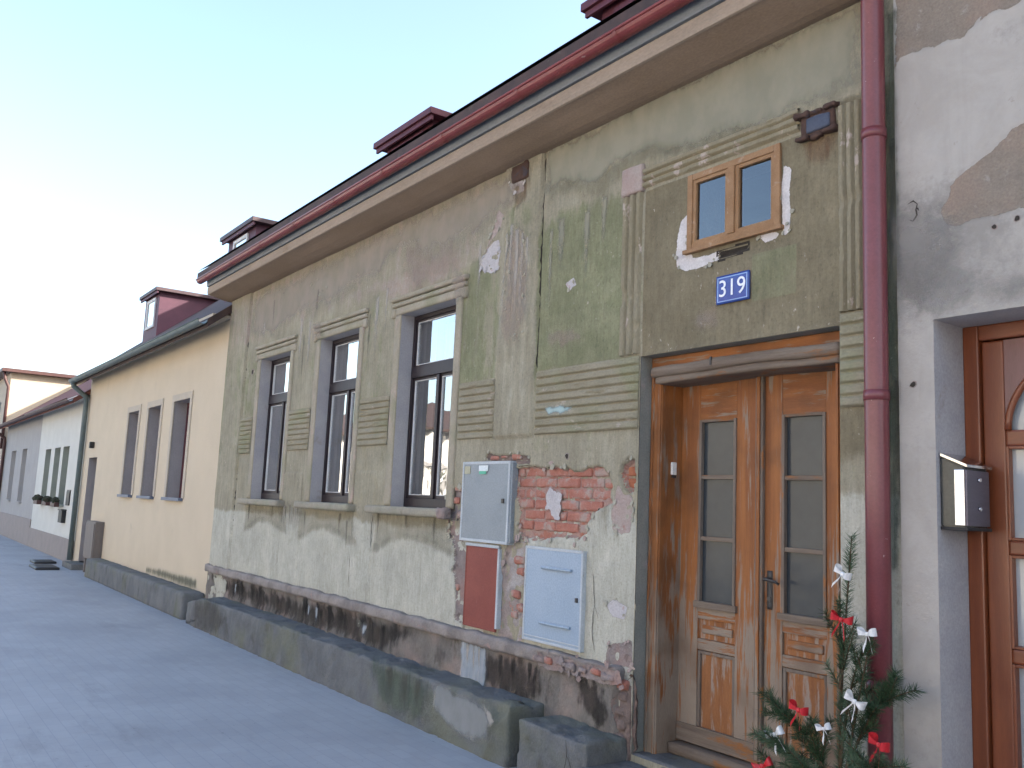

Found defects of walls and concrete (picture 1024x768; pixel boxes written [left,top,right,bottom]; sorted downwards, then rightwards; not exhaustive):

flaking render [895,0,1021,67]
damp [547,10,857,188]
peeling [479,210,528,297]
flaking render [672,215,719,271]
flaking render [756,166,795,243]
flaking render [941,124,1024,230]
flaking render [444,482,466,628]
flaking render [484,450,639,641]
damp [467,645,540,698]
flaking render [533,640,639,752]
damp [578,679,607,726]